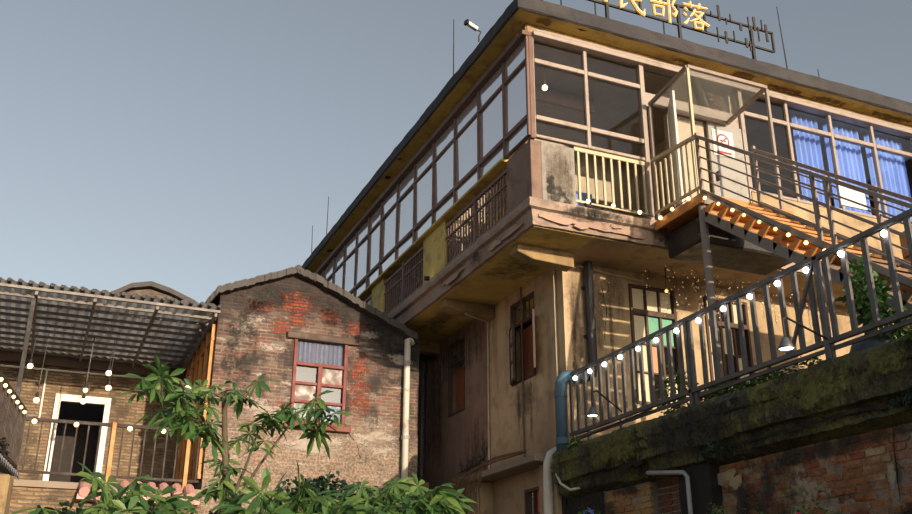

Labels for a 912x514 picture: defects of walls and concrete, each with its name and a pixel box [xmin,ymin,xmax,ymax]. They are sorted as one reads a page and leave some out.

water stain [546,155,632,223]
peeling [717,468,742,490]
crack [892,425,906,498]